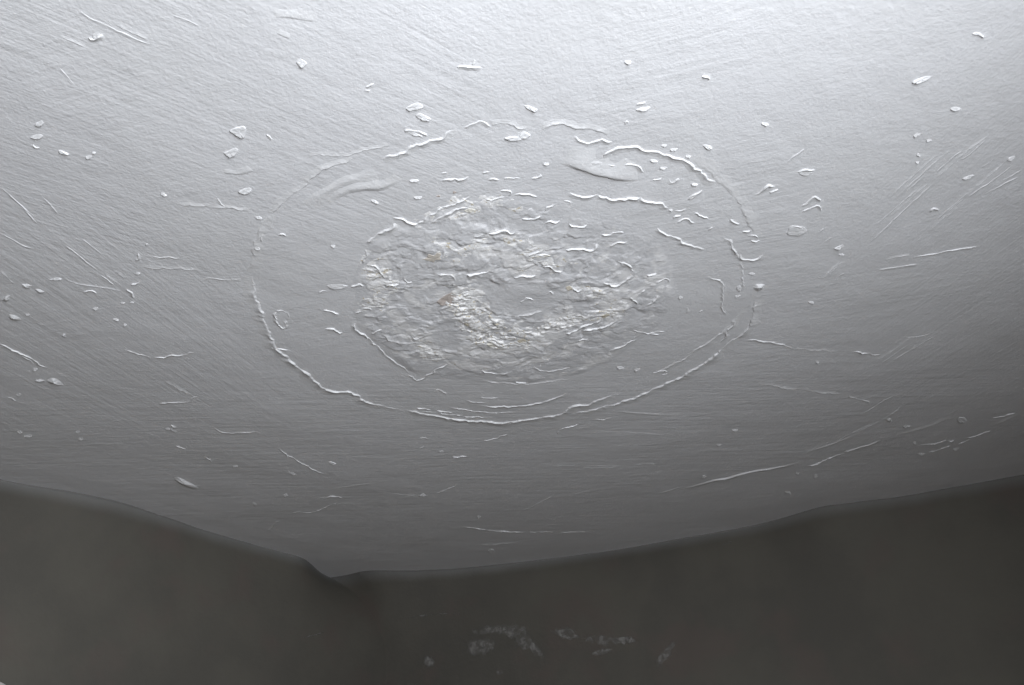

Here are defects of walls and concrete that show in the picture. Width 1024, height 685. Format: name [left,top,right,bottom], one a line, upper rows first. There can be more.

peeling [224,126,246,158]
peeling [406,103,431,122]
peeling [650,159,713,230]
flaking render [318,162,703,385]